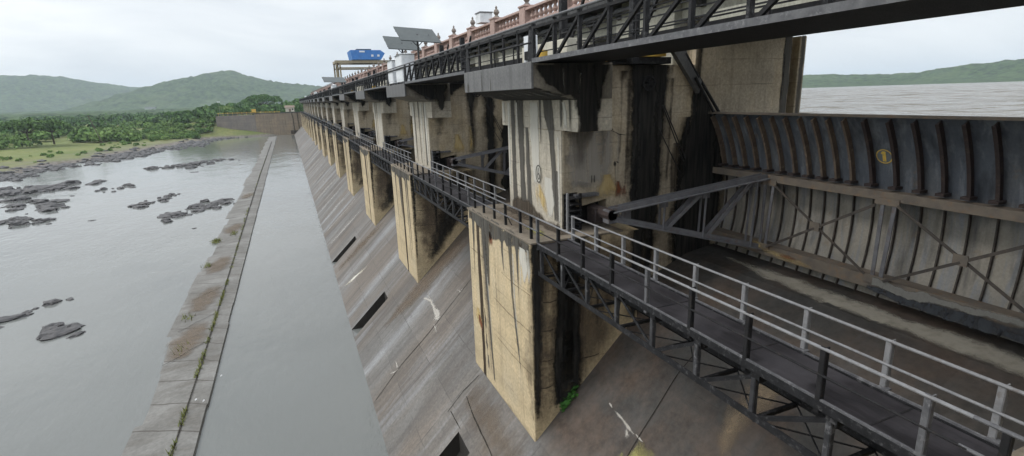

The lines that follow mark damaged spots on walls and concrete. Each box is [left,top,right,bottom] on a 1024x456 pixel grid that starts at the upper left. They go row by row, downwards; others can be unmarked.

leakage [343,63,725,418]